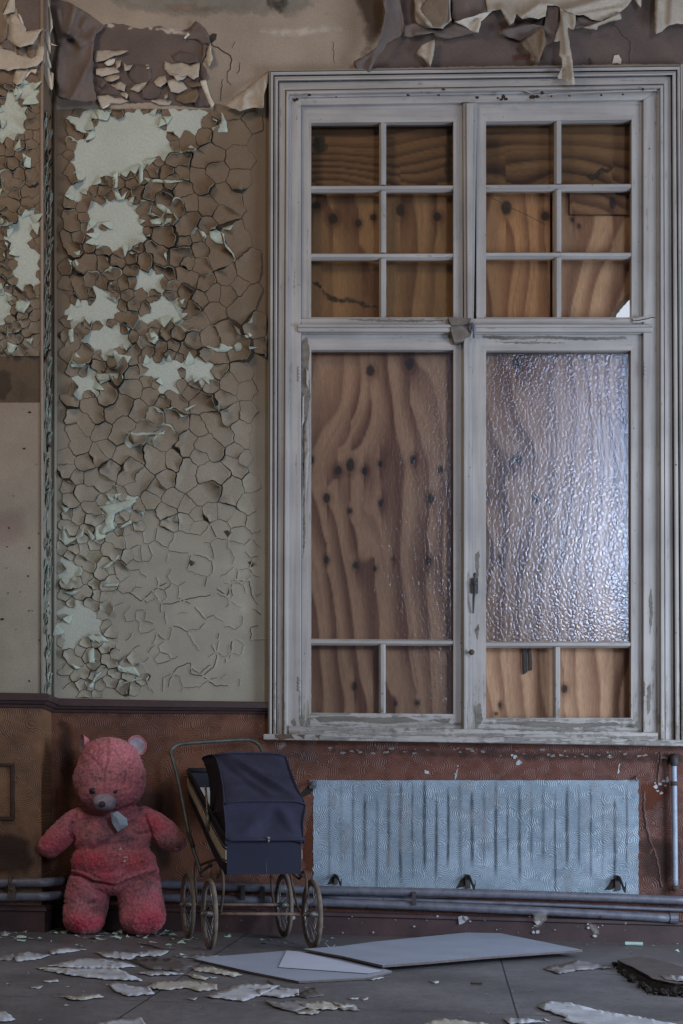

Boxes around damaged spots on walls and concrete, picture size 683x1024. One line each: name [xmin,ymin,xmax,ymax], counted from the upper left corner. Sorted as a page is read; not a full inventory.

peeling [372,0,683,68]
peeling [0,0,269,698]
crack [105,512,266,694]